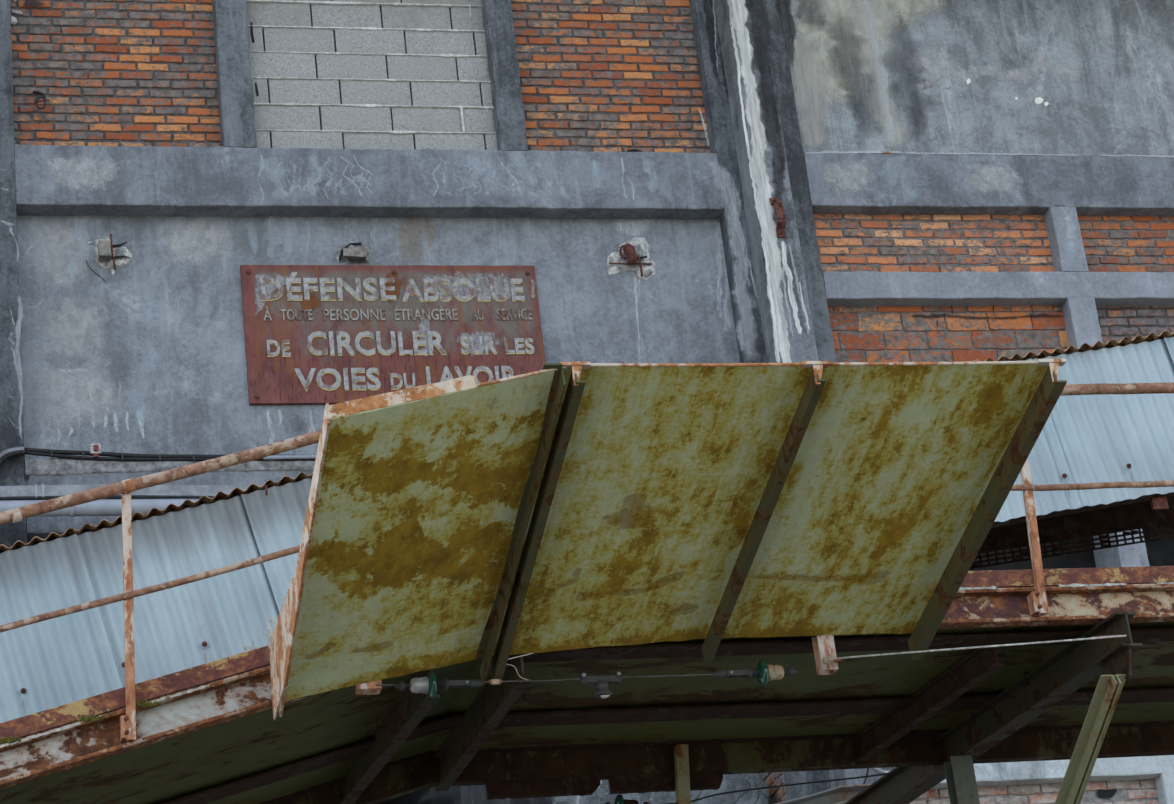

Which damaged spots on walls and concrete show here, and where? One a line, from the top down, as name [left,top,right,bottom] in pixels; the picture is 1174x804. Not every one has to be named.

damp [857,0,902,145]
damp [704,0,827,363]
spalling [87,236,133,276]
spalling [607,238,655,280]